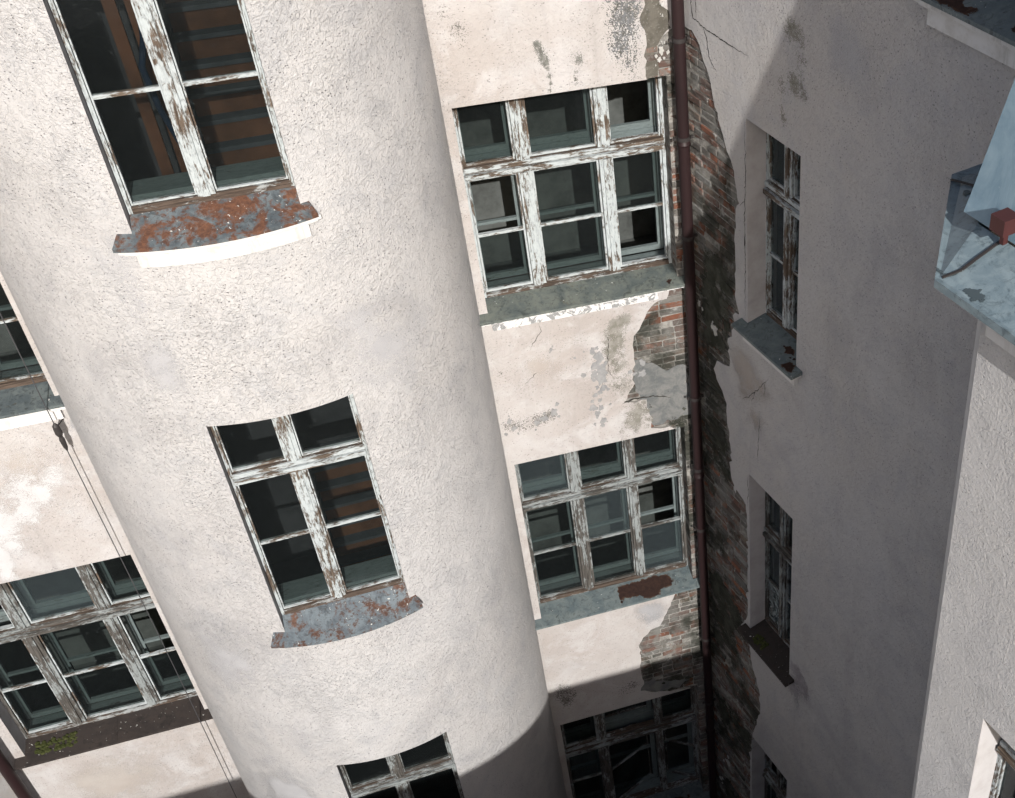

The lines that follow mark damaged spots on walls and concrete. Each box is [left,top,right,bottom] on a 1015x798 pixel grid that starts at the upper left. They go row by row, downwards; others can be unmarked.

leakage [598,0,650,78]
crack [690,2,749,70]
corrosion [936,0,978,16]
peeling [570,346,612,427]
spalling [626,0,760,798]
corrosion [617,574,673,603]